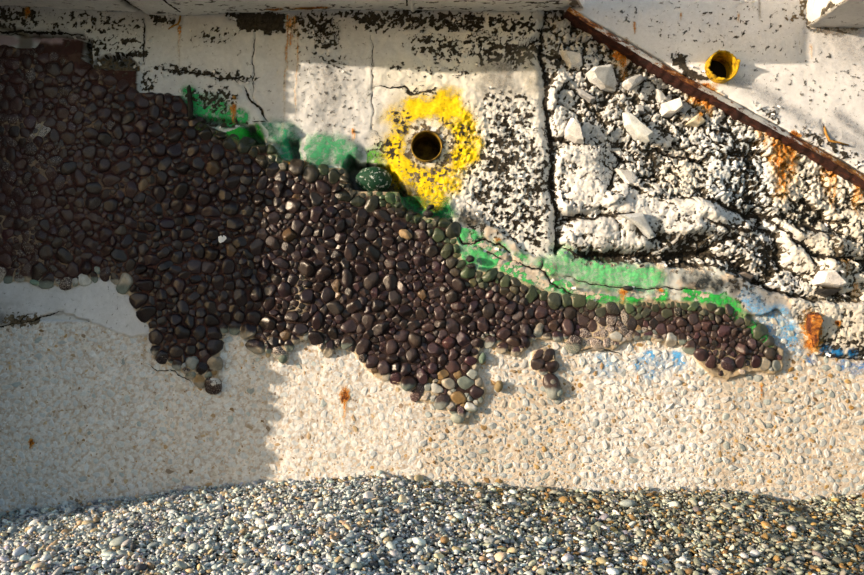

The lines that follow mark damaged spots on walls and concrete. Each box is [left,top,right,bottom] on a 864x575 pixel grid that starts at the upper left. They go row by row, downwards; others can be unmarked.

crack [124,0,267,122]
corrosion [266,6,328,60]
crack [370,35,434,136]
corrosion [689,82,720,120]
peeling [189,0,864,297]
crack [458,18,864,303]
corrosion [755,130,802,194]
crack [0,311,59,328]
corrosion [801,311,824,355]
corrosion [339,386,350,418]